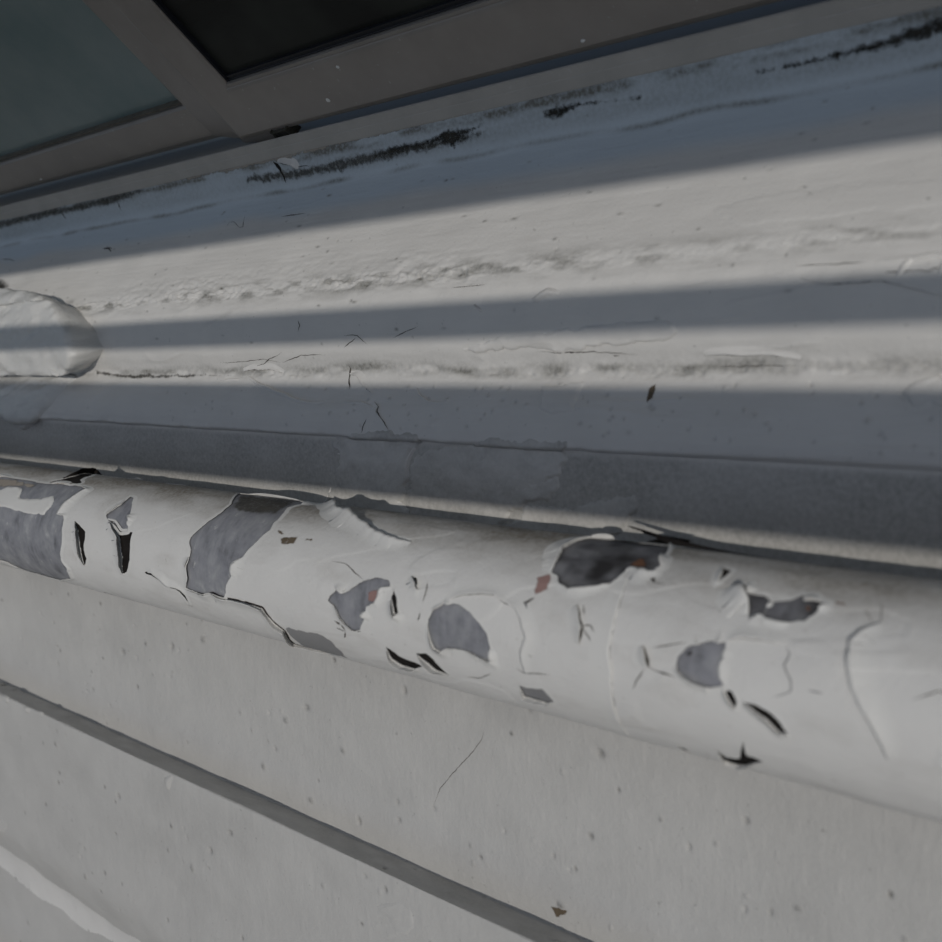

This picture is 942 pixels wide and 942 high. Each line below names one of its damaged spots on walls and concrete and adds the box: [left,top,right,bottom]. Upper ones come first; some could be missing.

water stain [784,18,942,68]
water stain [247,127,479,183]
peeling [0,473,94,582]
peeling [104,495,140,535]
peeling [180,493,412,600]
peeling [326,573,394,634]
peeling [423,597,503,673]
peeling [671,581,835,697]